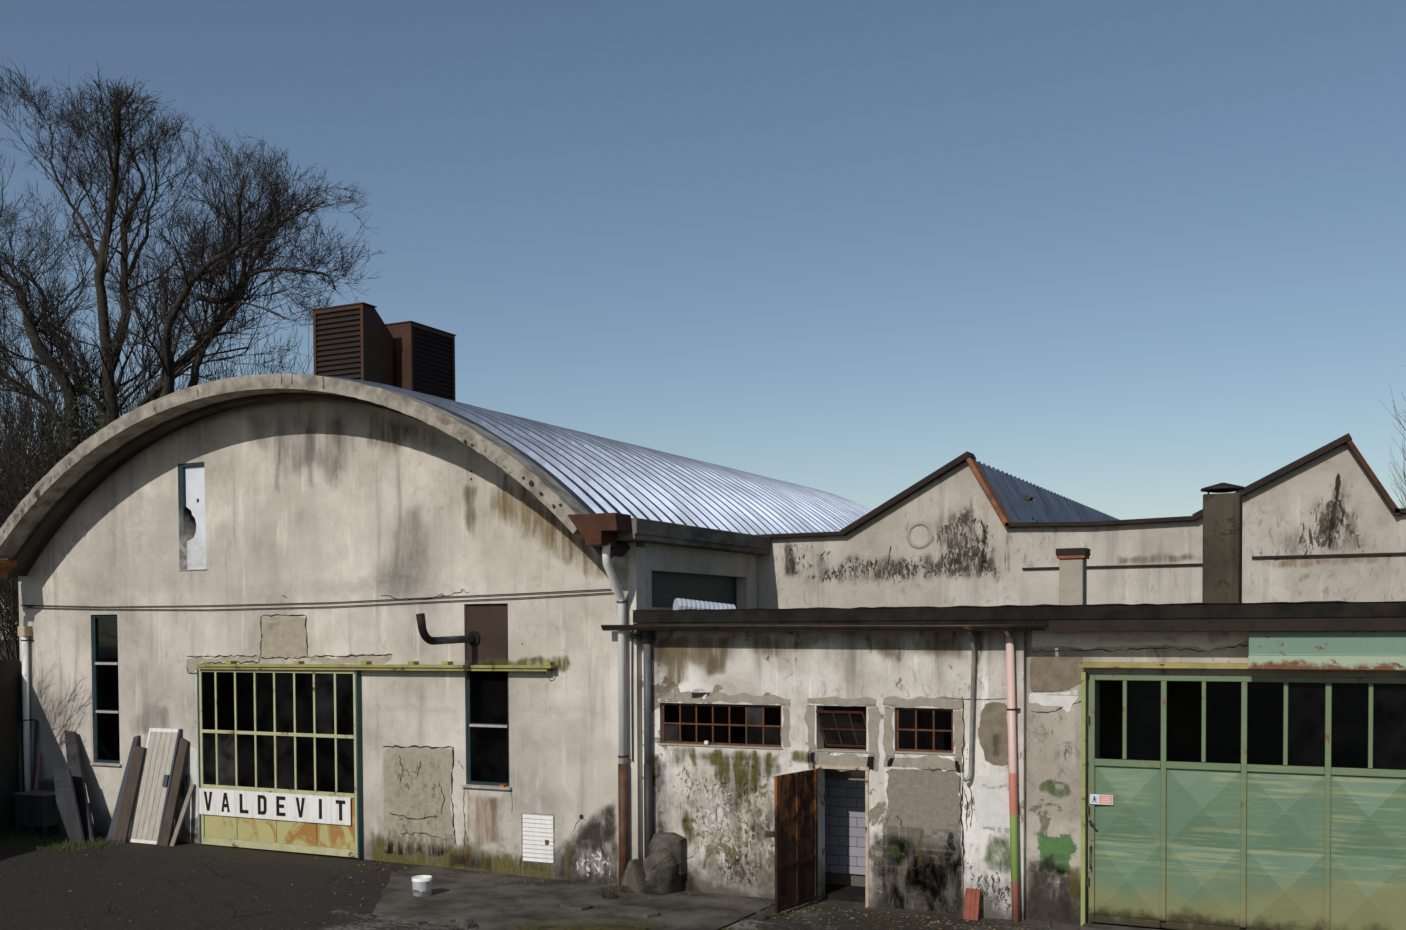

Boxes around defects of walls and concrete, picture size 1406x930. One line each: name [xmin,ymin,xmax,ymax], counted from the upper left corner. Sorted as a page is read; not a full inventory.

leakage [465,488,474,526]
leakage [498,478,602,569]
flaking render [186,614,392,674]
flaking render [383,745,456,857]
leakage [653,756,664,795]
leakage [715,750,771,787]
leakage [558,807,617,886]
leakage [872,837,963,915]